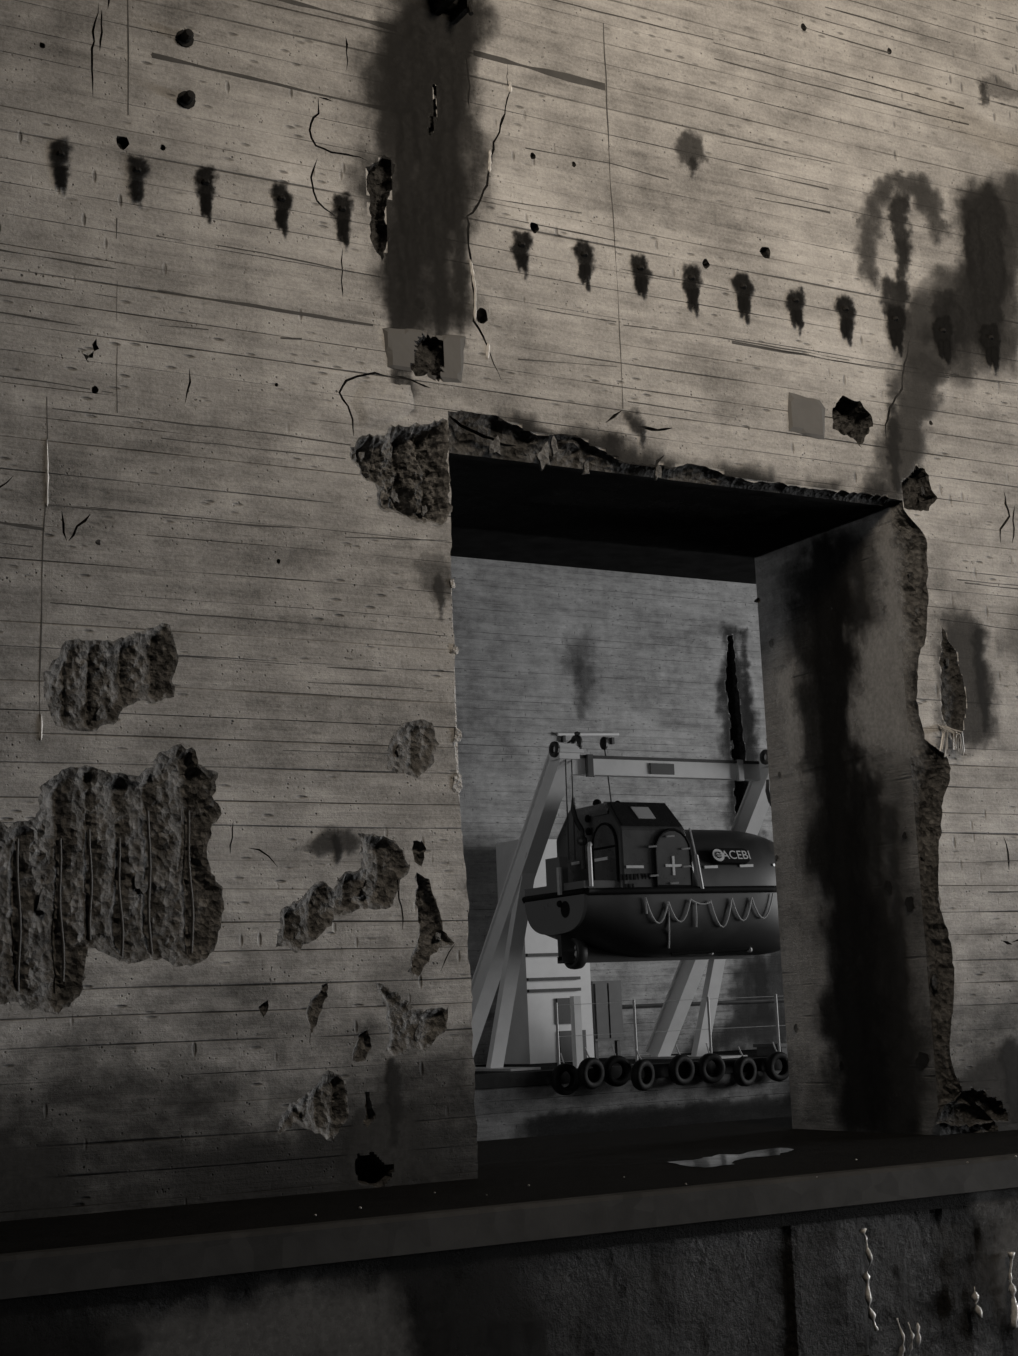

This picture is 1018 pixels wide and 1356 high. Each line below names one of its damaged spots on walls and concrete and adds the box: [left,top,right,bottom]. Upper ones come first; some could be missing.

leakage [353,0,493,352]
leakage [857,172,1018,500]
spalling [832,396,873,447]
spalling [43,623,179,732]
leakage [717,626,759,761]
leakage [938,613,997,750]
spalling [0,744,224,1014]
spalling [276,833,454,977]
spalling [350,410,1009,1135]
leakage [778,518,922,1134]
leakage [709,950,787,1052]
spalling [276,1070,349,1141]